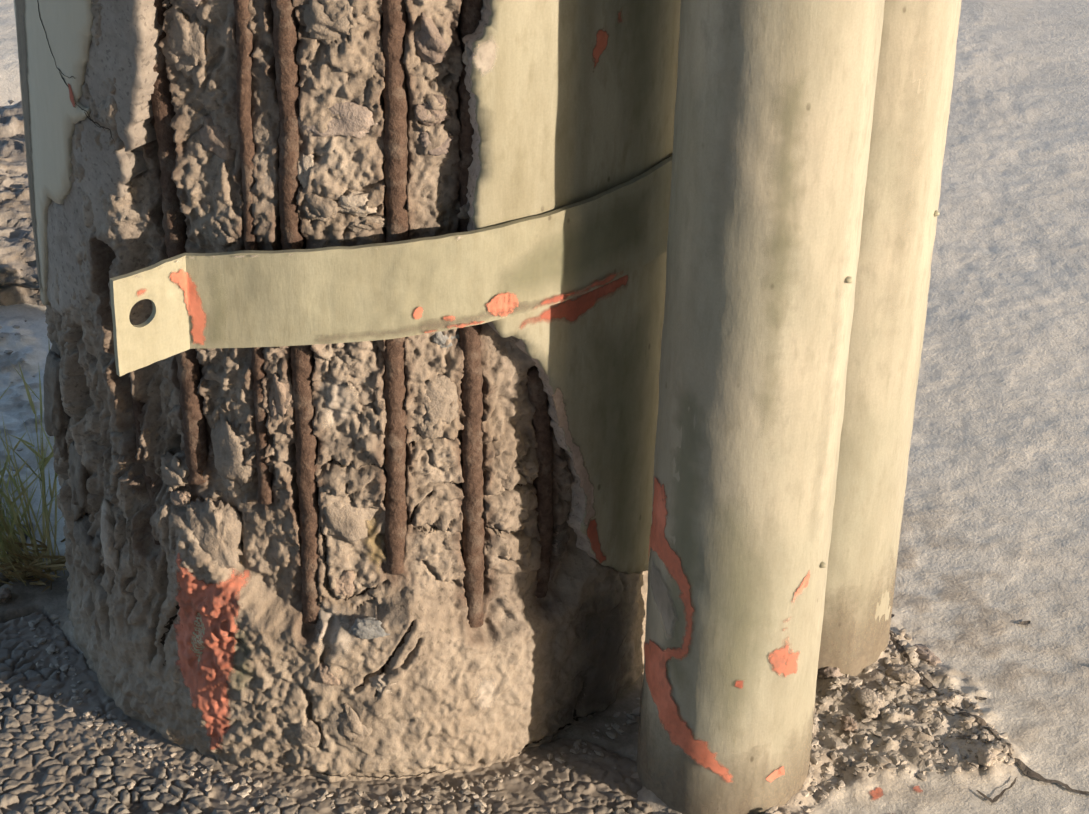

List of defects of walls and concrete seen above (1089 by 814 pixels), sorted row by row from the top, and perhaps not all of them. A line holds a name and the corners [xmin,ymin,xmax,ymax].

crack [37,0,115,143]
spalling [43,0,733,783]
crack [408,481,458,534]
crack [356,621,414,693]
peeling [769,645,799,677]
crack [890,630,1089,803]